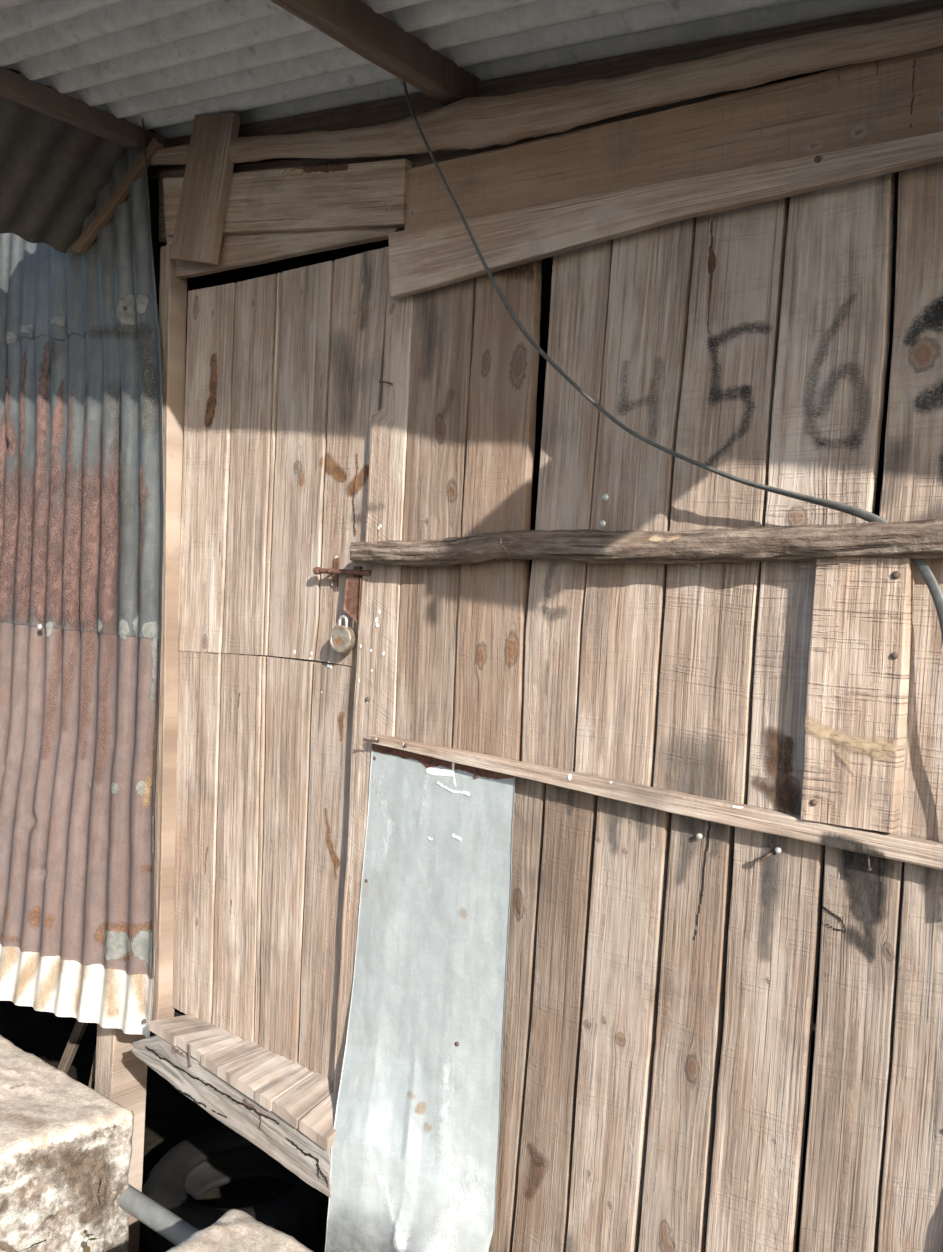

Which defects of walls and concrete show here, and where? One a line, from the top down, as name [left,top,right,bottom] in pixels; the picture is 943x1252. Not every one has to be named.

crack [908,59,916,128]
rust [0,343,121,623]
rust [137,465,145,610]
rust [145,692,157,804]
water stain [754,729,800,815]
rust [1,937,40,1002]
rust [96,922,153,945]
water stain [822,834,887,963]
crack [145,1046,328,1188]